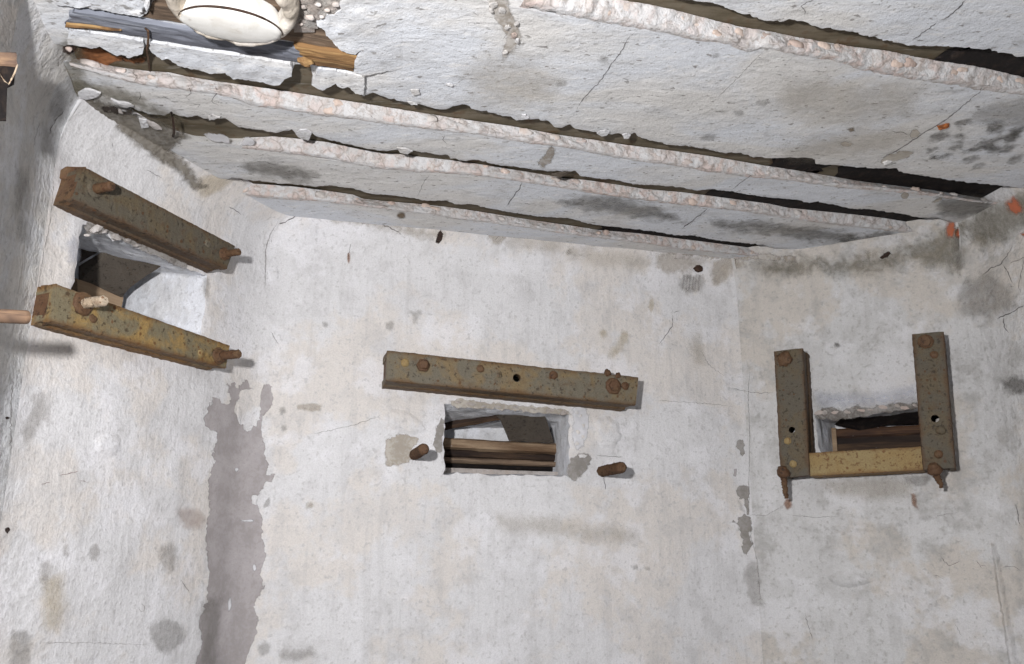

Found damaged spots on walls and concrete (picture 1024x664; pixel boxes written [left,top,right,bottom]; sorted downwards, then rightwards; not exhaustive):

crack [579,34,633,105]
spalling [52,0,1024,233]
spalling [84,222,187,268]
spalling [242,184,795,262]
corrosion [1007,198,1021,213]